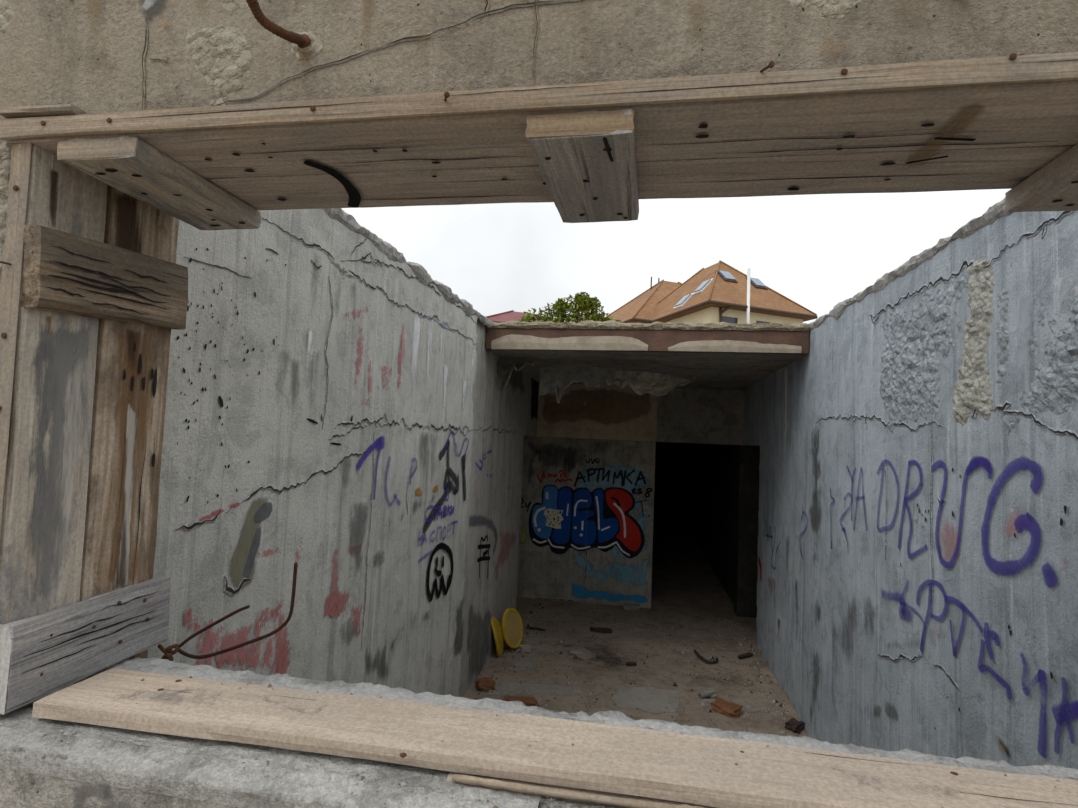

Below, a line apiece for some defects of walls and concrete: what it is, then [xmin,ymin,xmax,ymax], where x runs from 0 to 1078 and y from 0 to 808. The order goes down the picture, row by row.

spalling [186,25,253,106]
spalling [218,0,323,59]
crack [214,0,582,106]
spalling [789,0,867,26]
crack [186,257,252,279]
crack [869,211,1074,325]
spalling [880,258,1078,436]
crack [224,217,517,647]
crack [971,400,1078,441]
crack [815,413,945,619]